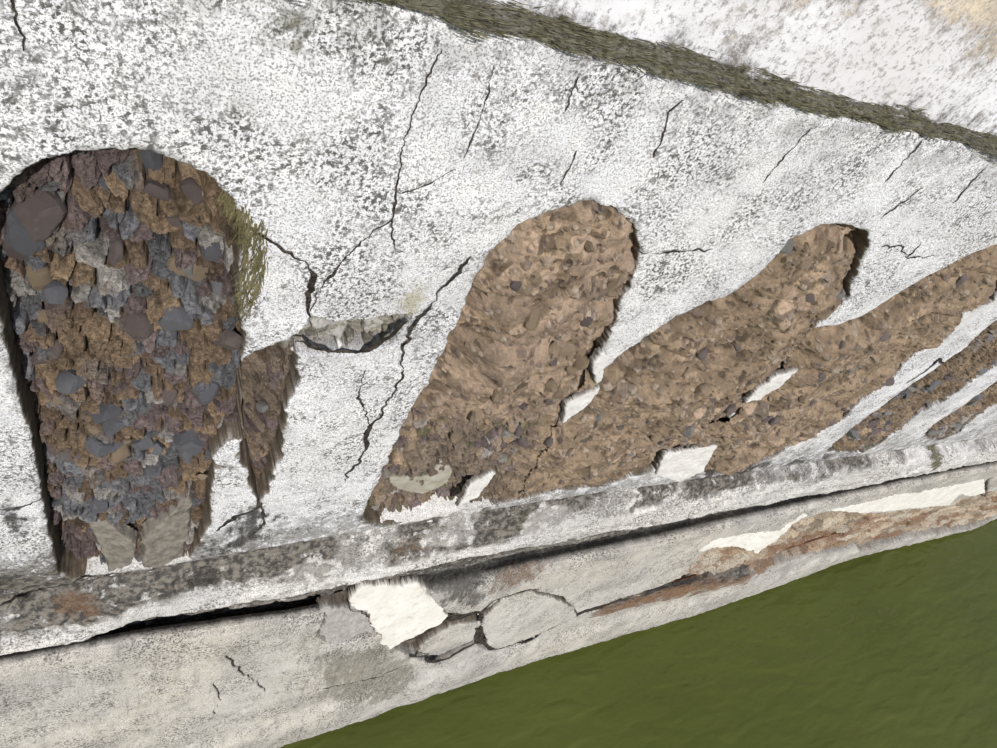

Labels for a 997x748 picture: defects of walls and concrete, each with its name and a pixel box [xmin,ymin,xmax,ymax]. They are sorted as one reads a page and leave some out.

water stain [280,9,302,50]
crack [250,50,495,317]
crack [295,257,471,481]
spalling [667,479,997,584]
crack [226,655,265,691]
crack [317,589,621,690]
corrosion [589,570,760,618]